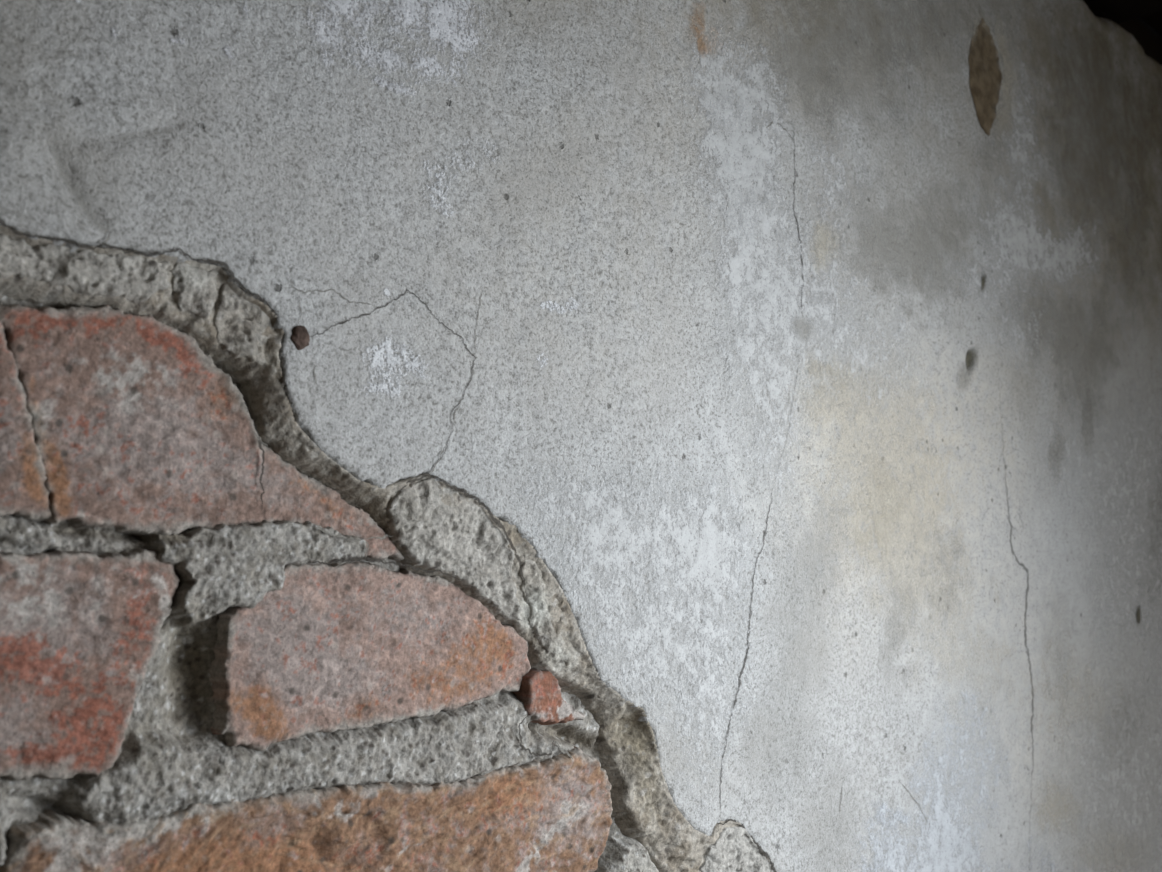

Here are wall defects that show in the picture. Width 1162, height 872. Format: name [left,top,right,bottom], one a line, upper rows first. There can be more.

crack [0,218,527,596]
flaking render [0,225,774,872]
crack [718,512,777,872]
peeling [862,691,1010,872]